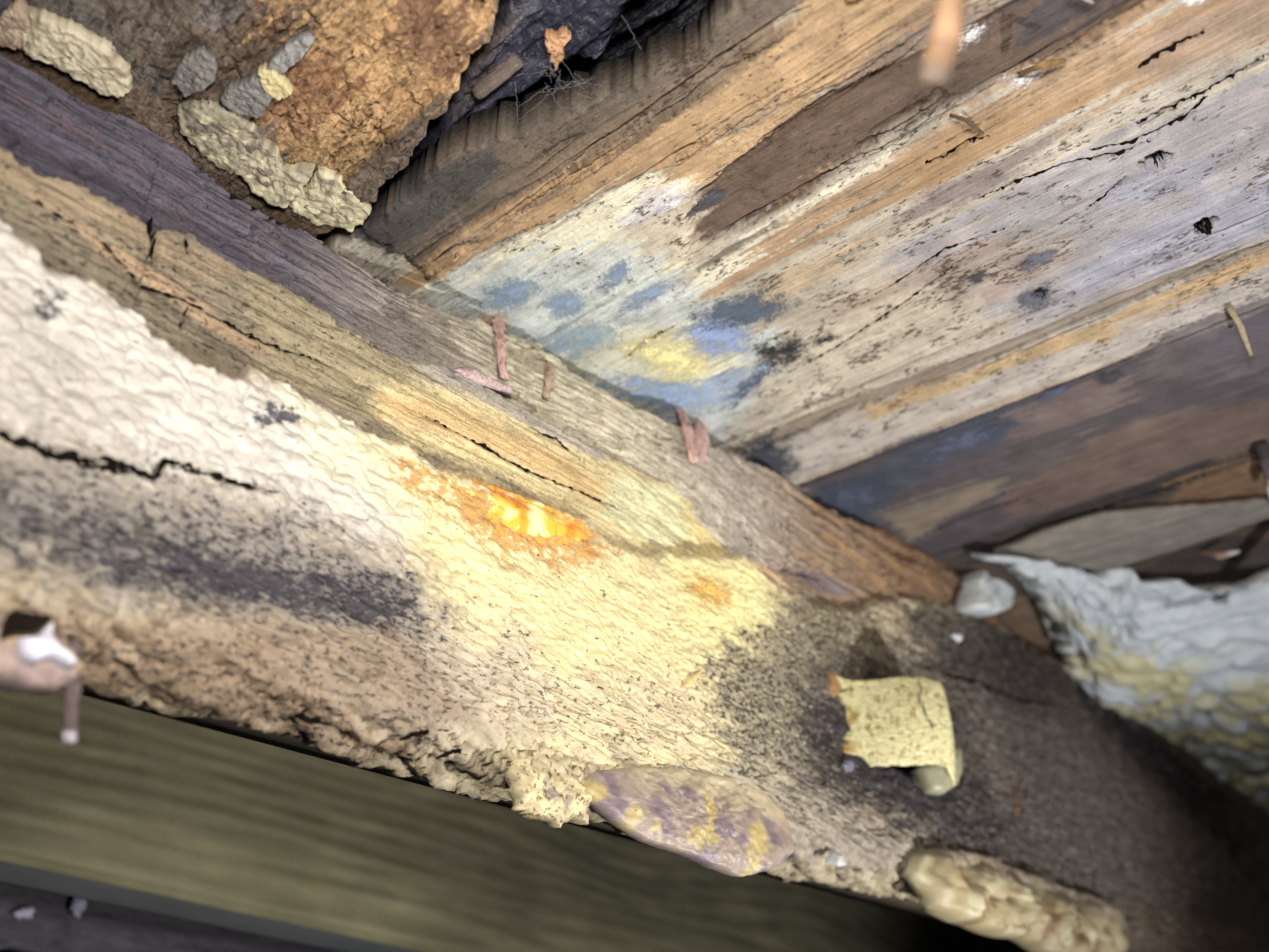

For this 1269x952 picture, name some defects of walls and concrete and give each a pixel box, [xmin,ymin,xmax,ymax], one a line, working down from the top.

crack [1138,30,1205,69]
crack [980,55,1264,210]
crack [0,430,277,493]
peeling [832,672,962,795]